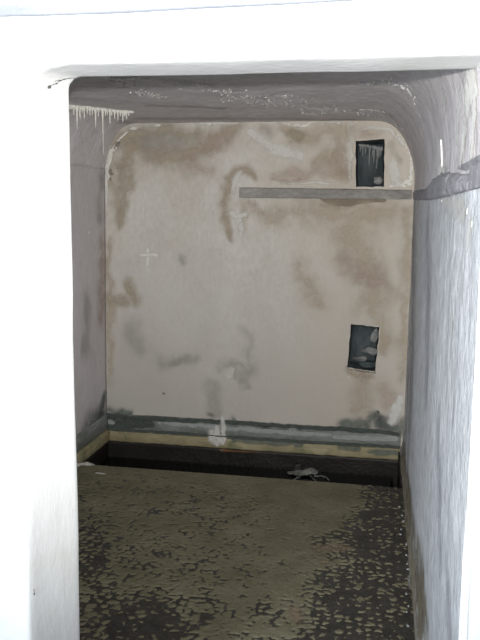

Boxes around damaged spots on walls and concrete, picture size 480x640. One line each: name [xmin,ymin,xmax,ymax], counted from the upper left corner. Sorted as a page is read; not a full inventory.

damp [261,121,413,188]
damp [223,167,256,240]
damp [318,199,386,218]
damp [402,294,414,423]
damp [209,416,226,446]